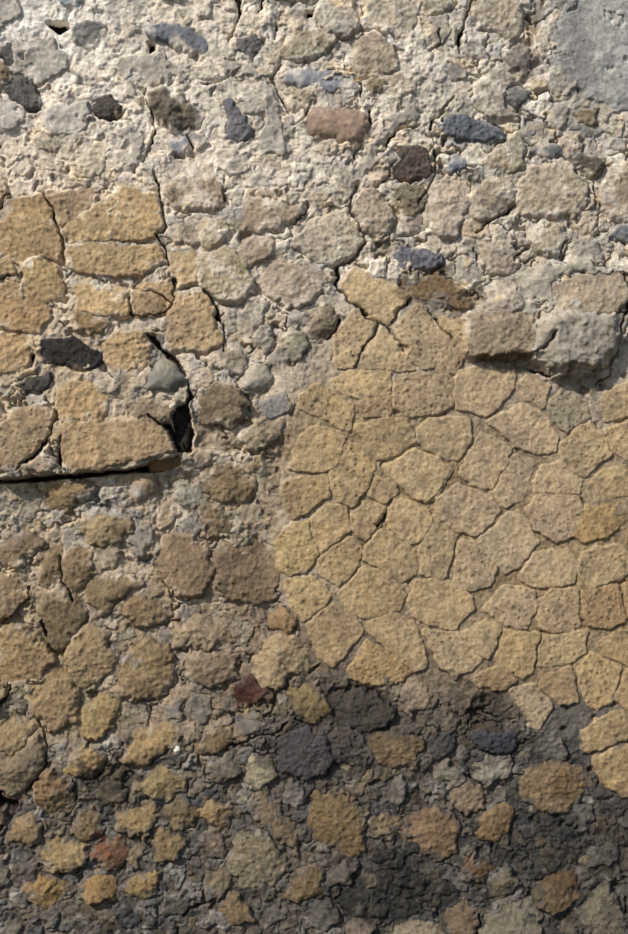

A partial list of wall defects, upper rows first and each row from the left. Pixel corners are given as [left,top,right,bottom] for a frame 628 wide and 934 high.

crack [147,334,193,411]
crack [164,424,175,441]
crack [23,440,63,468]